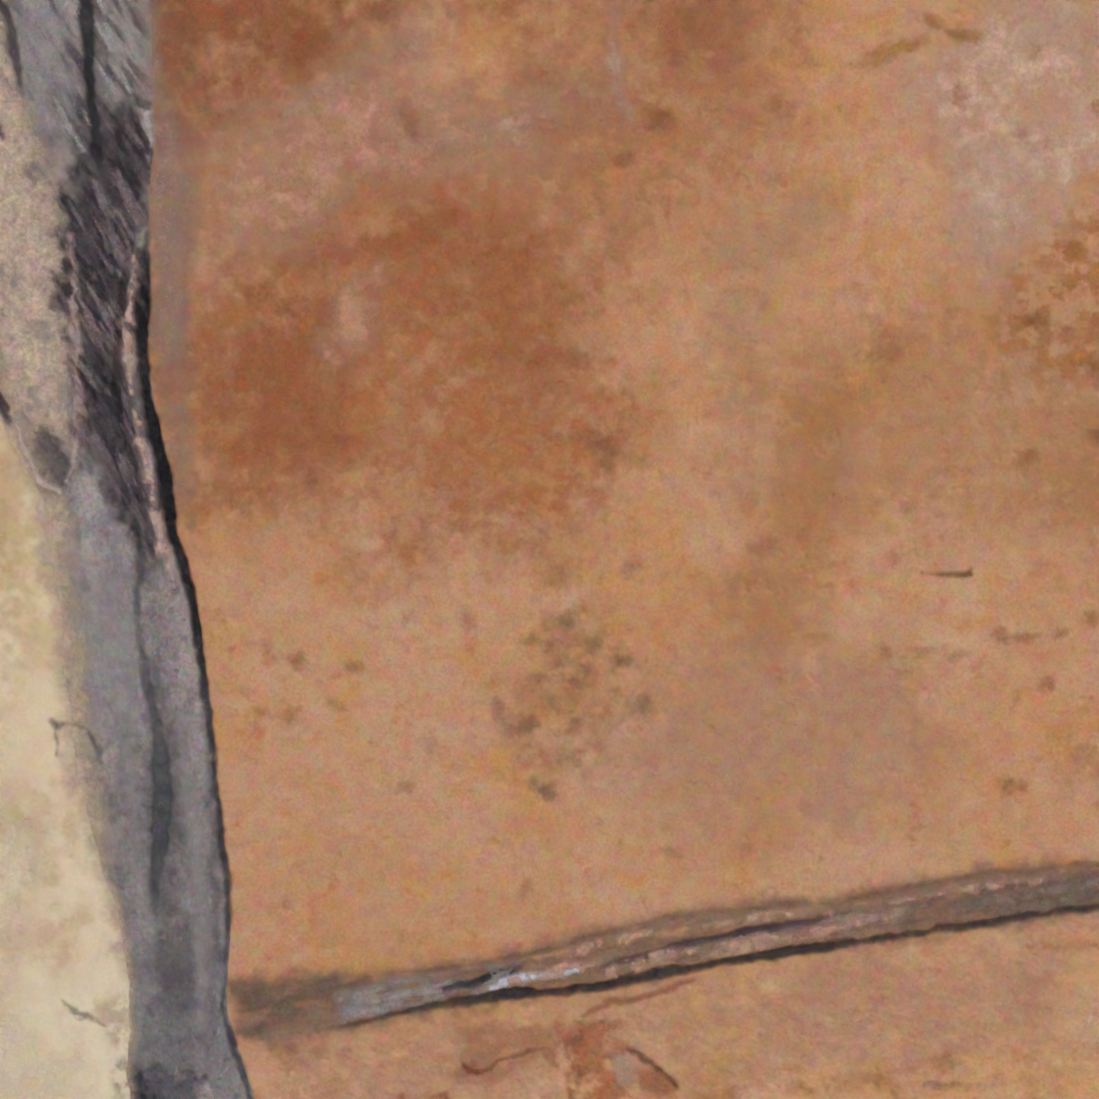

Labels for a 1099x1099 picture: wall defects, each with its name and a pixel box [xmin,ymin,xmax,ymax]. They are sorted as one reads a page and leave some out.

crack [80,0,101,168]
crack [114,251,230,930]
crack [228,1027,251,1099]
flaking render [463,979,694,1099]
flaking render [232,866,1099,1044]
crack [388,871,1099,1016]